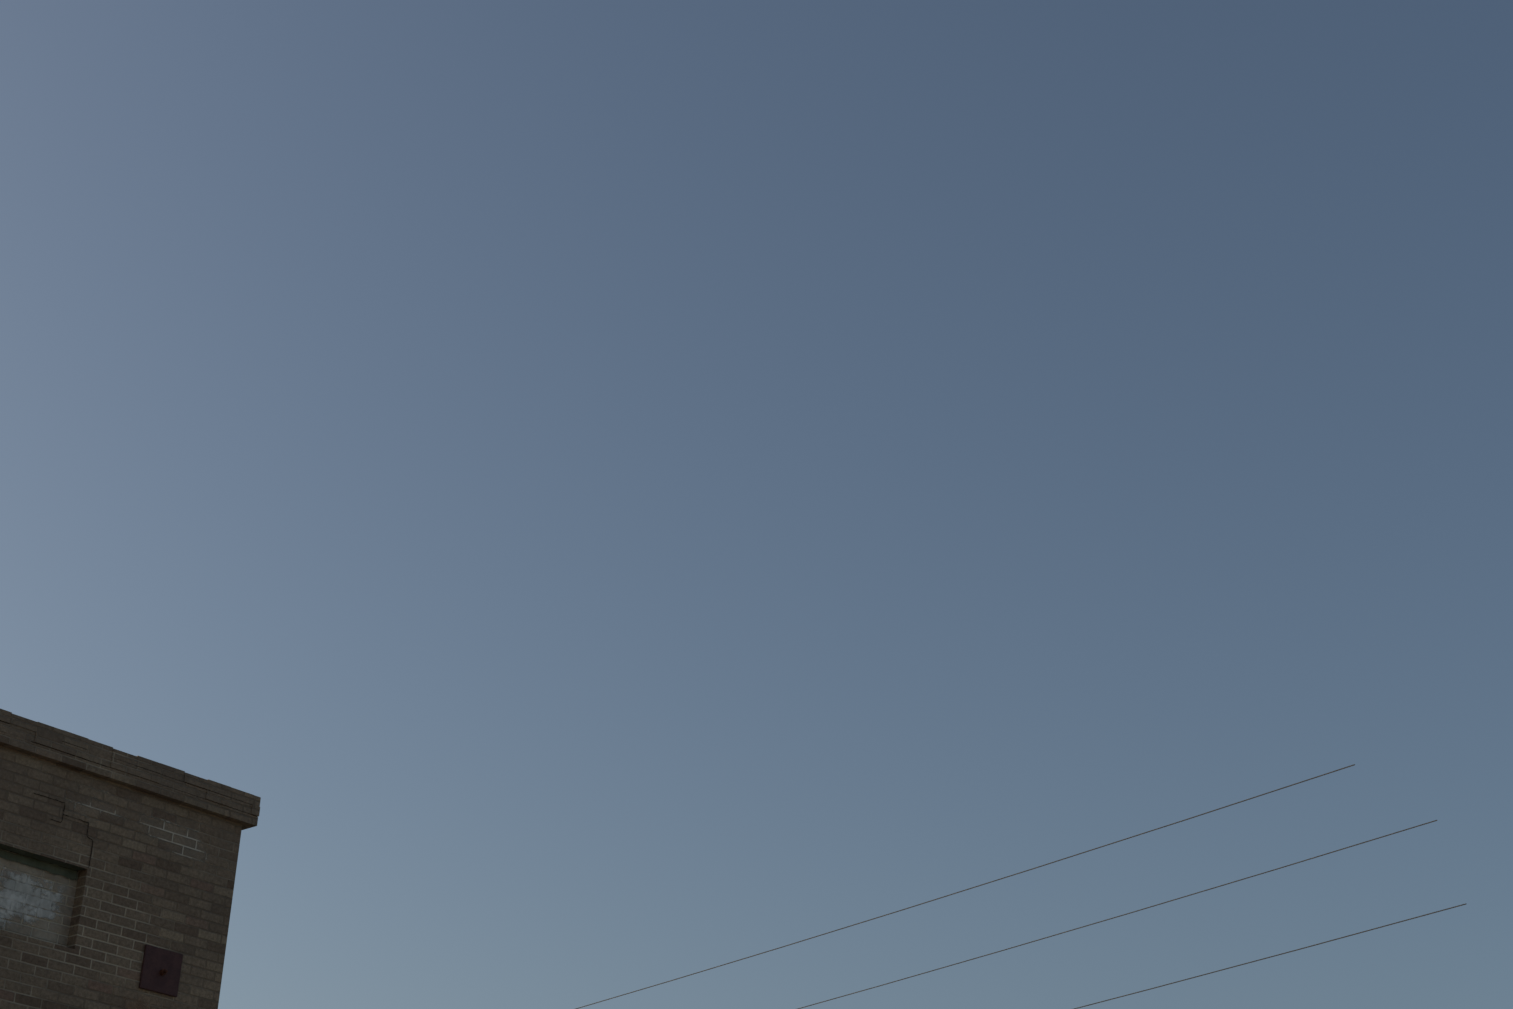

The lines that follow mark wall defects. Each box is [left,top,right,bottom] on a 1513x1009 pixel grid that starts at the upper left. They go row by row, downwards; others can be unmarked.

crack [33,793,93,866]